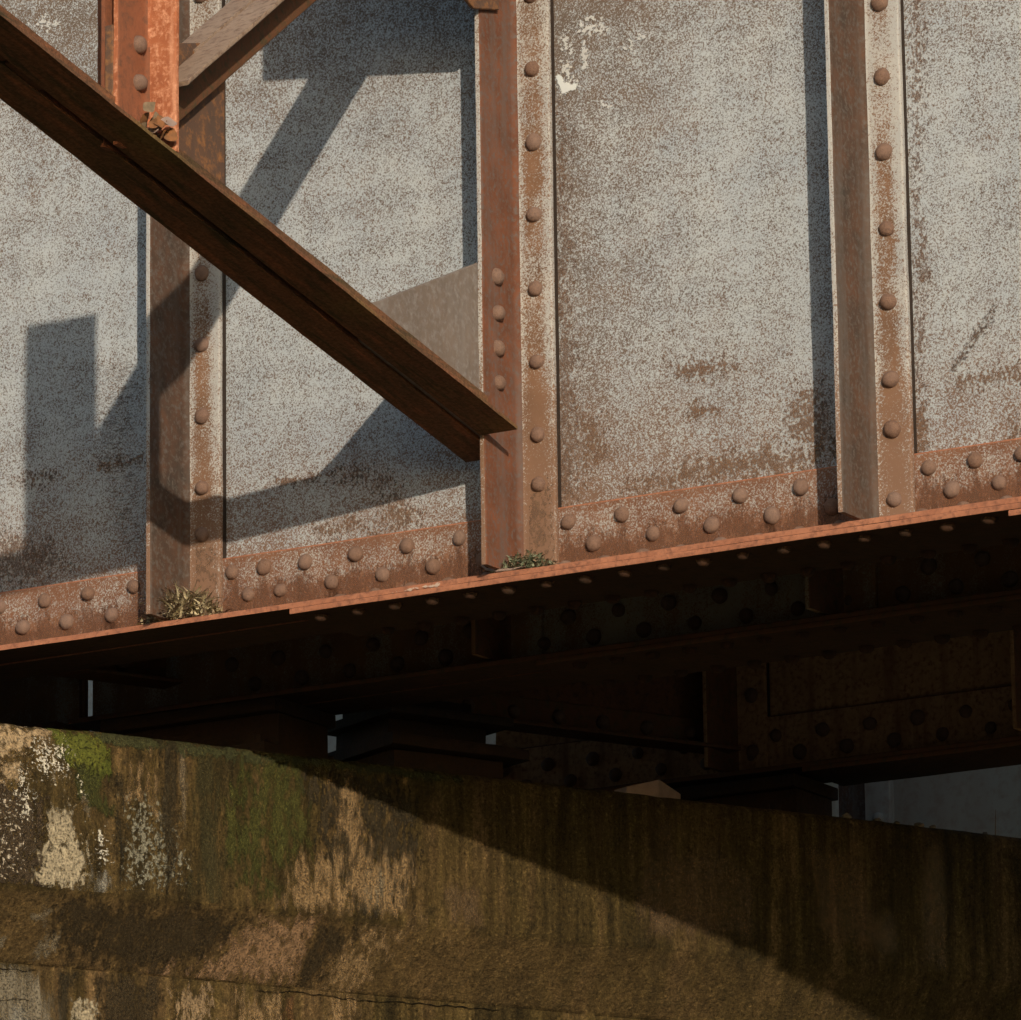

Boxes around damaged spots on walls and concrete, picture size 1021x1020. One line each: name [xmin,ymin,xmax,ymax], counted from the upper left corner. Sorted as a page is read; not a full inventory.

peeling [556,15,610,99]
corrosion [529,100,841,563]
corrosion [3,464,64,493]
corrosion [88,452,146,473]
corrosion [273,459,427,543]
corrosion [0,524,82,591]
corrosion [196,542,491,612]
corrosion [0,595,154,645]
damp [0,740,428,1020]